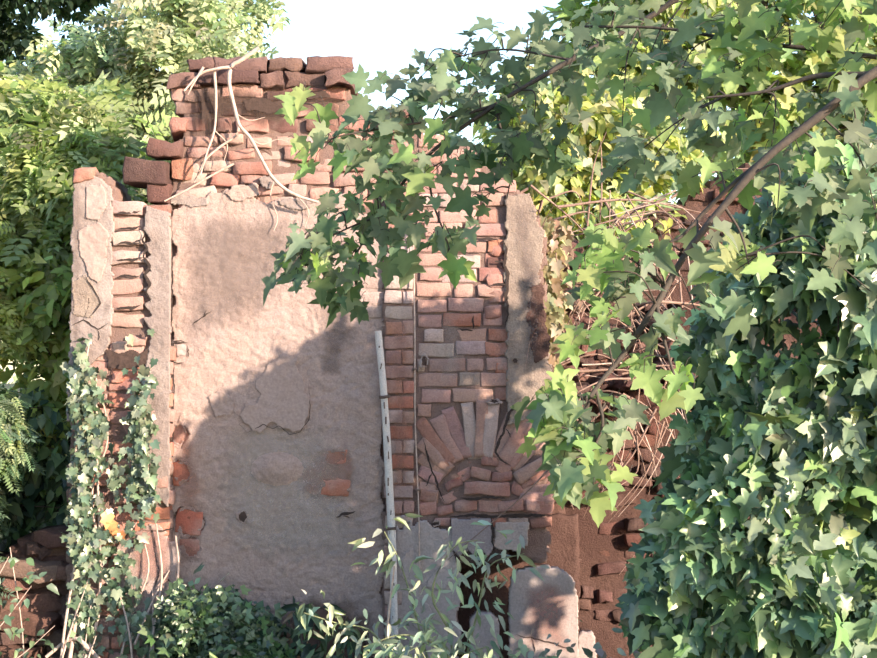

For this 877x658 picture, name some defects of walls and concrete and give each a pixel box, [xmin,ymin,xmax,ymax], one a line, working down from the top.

flaking render [170,86,382,210]
spalling [526,283,551,363]
spalling [170,416,189,449]
peeling [208,354,312,435]
spalling [172,460,196,486]
spalling [174,506,205,562]